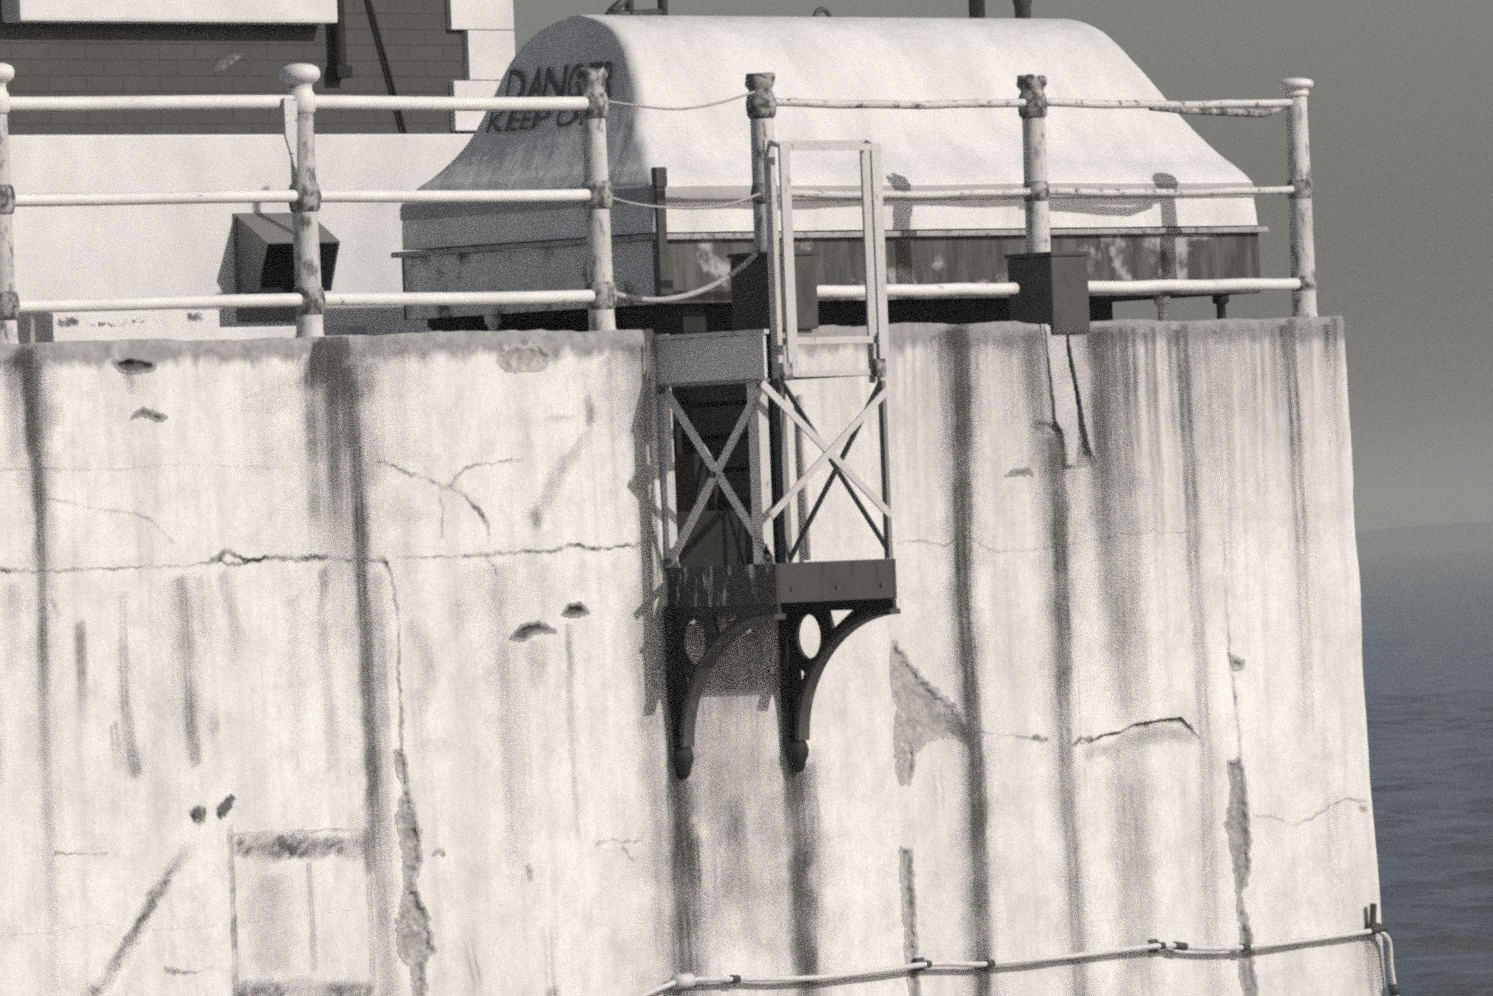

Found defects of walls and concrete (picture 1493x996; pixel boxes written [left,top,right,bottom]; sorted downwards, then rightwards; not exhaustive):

damp [10,343,48,670]
crack [212,552,324,564]
damp [309,337,381,855]
spalling [510,601,590,642]
crack [528,543,629,553]
spalling [890,639,974,786]
damp [947,324,991,996]
damp [1032,331,1072,761]
damp [1093,327,1157,487]
spalling [394,748,437,996]
spalling [899,846,922,996]
spalling [1224,756,1259,996]